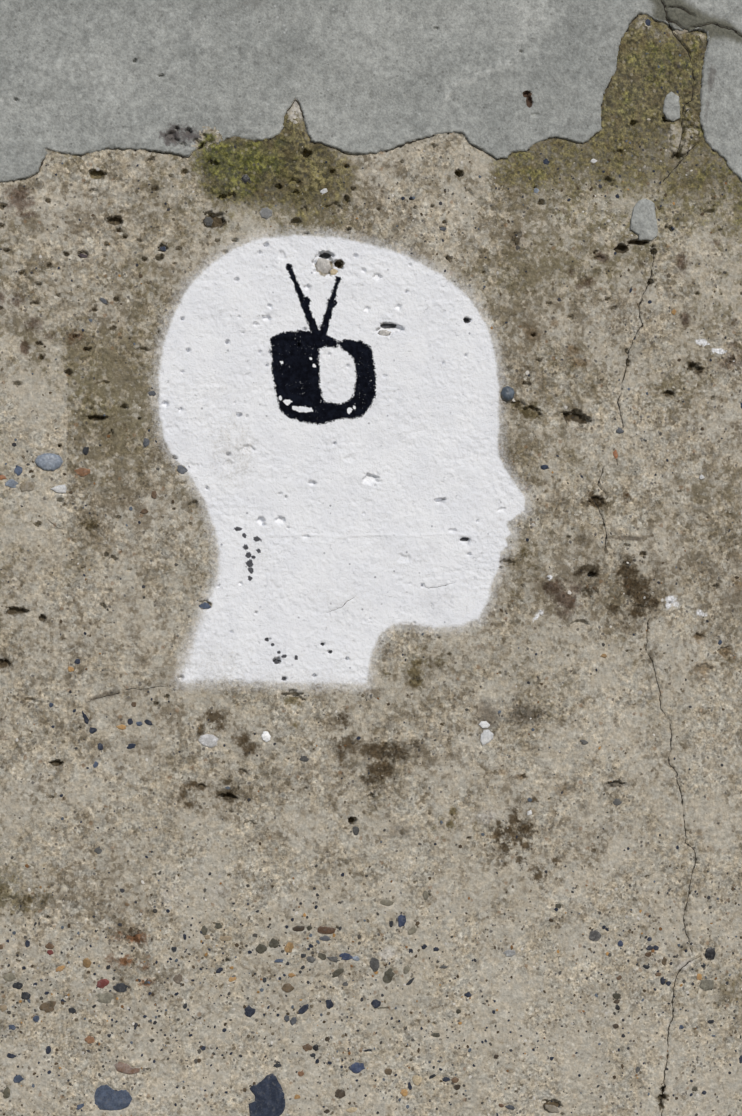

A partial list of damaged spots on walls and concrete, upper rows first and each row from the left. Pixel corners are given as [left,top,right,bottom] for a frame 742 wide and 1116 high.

flaking render [155,118,205,152]
flaking render [522,89,533,109]
flaking render [663,92,703,160]
crack [661,0,742,181]
spalling [88,168,107,180]
flaking render [613,198,658,255]
spalling [319,253,345,269]
crack [617,243,655,429]
crack [592,463,618,552]
peeling [233,527,263,582]
peeling [264,637,298,664]
crack [646,620,699,1115]